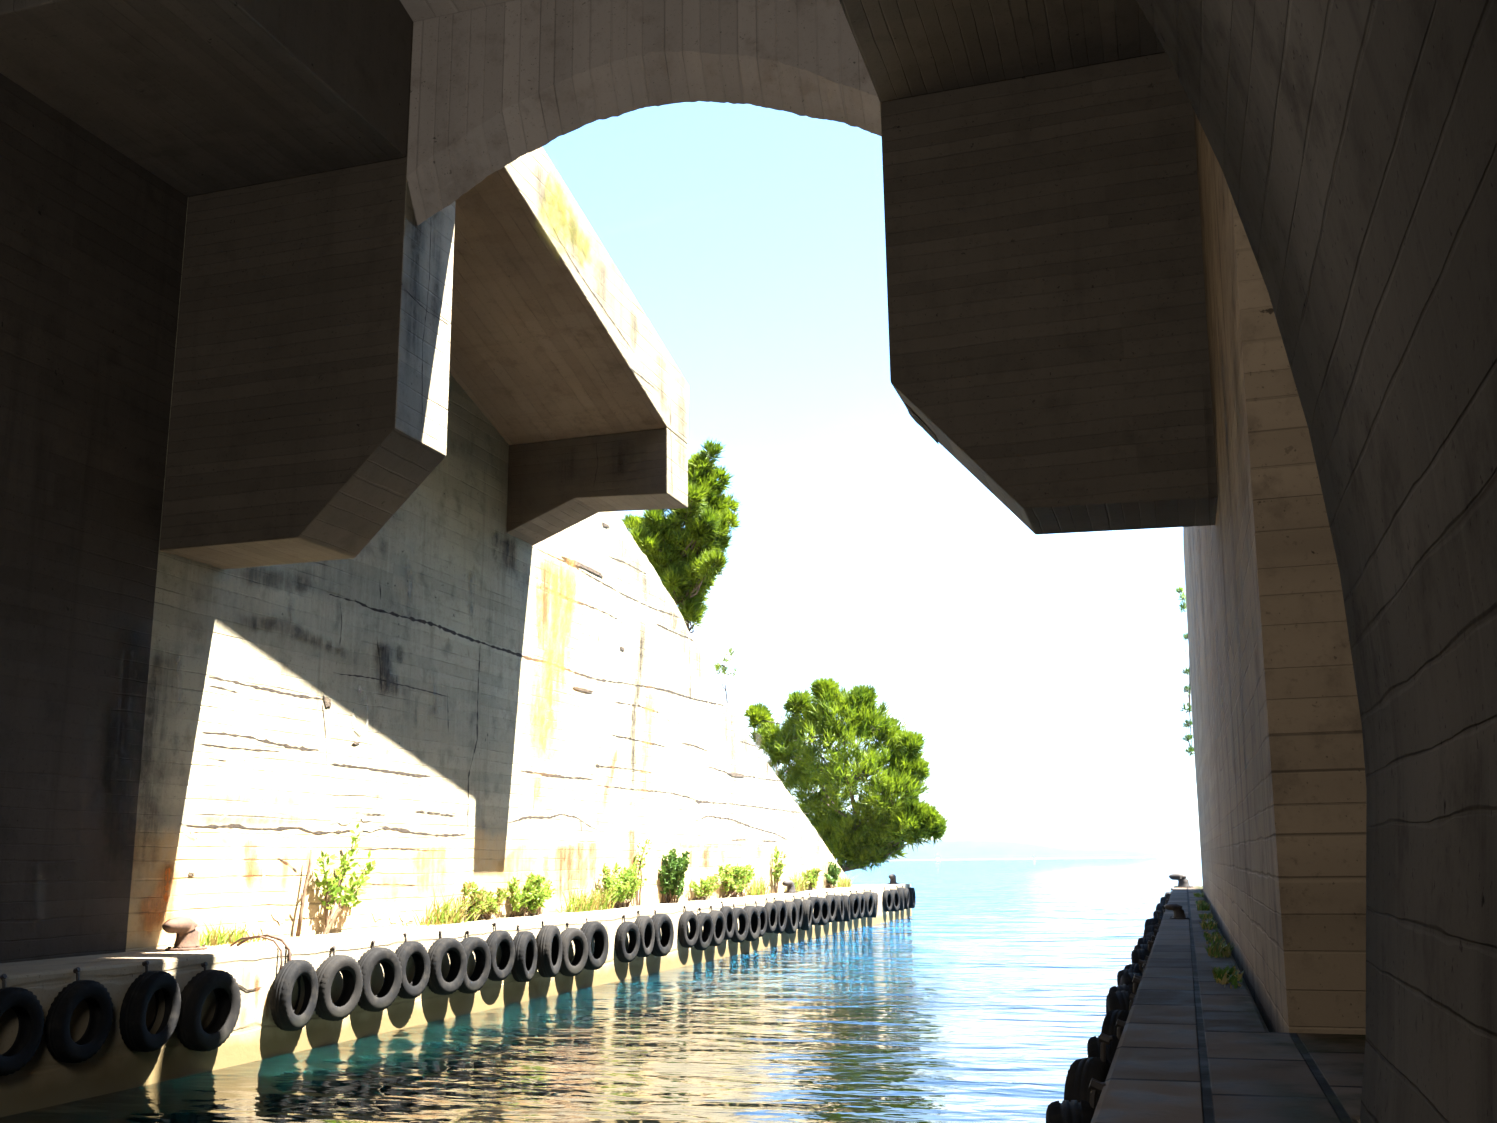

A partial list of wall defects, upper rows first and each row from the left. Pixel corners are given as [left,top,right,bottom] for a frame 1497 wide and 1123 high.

crack [181,549,808,886]
rust [531,561,573,744]
damp [631,626,645,779]
rust [546,843,596,895]